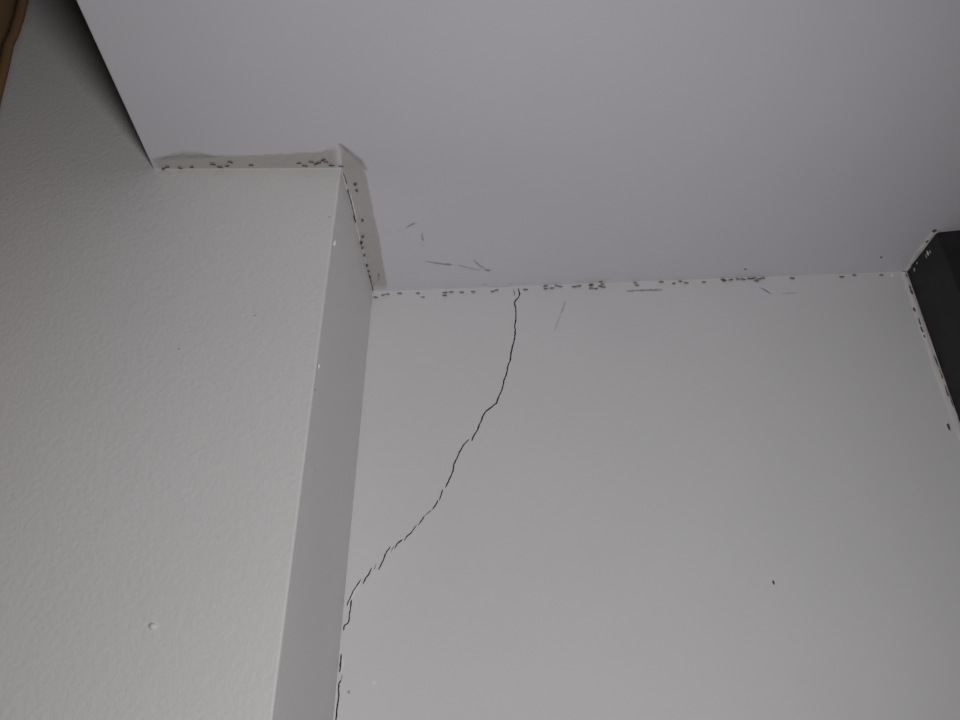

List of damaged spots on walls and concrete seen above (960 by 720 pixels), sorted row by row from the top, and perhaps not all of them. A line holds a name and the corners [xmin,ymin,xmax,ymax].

crack [343,288,520,630]
crack [333,654,344,720]